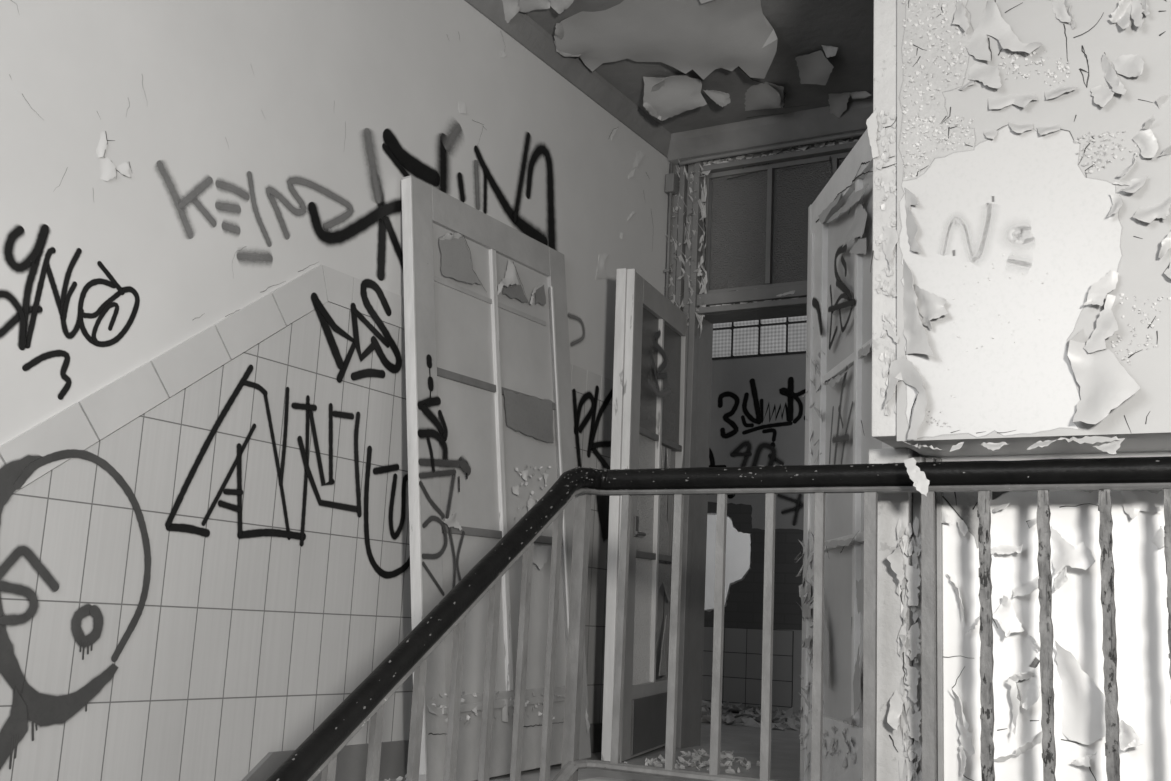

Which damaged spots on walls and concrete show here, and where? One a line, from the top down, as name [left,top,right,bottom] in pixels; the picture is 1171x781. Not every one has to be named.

peeling [502,0,803,121]
peeling [952,0,1166,110]
peeling [665,157,711,338]
peeling [795,45,1171,497]
spalling [941,492,1023,555]
spalling [992,484,1015,512]
peeling [1051,526,1095,590]
flaking render [704,502,861,777]
peeling [887,517,922,781]
peeling [945,656,982,781]
peeling [947,574,1043,762]
peeling [1055,640,1144,780]